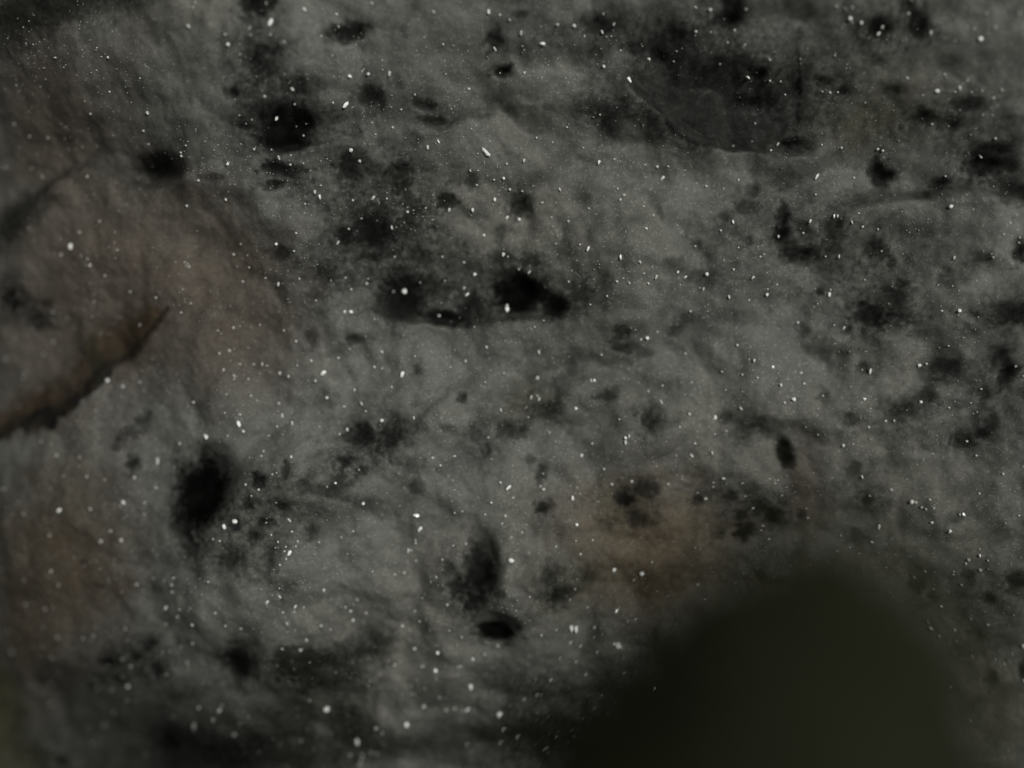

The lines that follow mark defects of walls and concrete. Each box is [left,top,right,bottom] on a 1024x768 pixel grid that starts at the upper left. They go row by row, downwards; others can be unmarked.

leakage [0,0,121,44]
leakage [0,55,279,390]
crack [0,307,164,439]